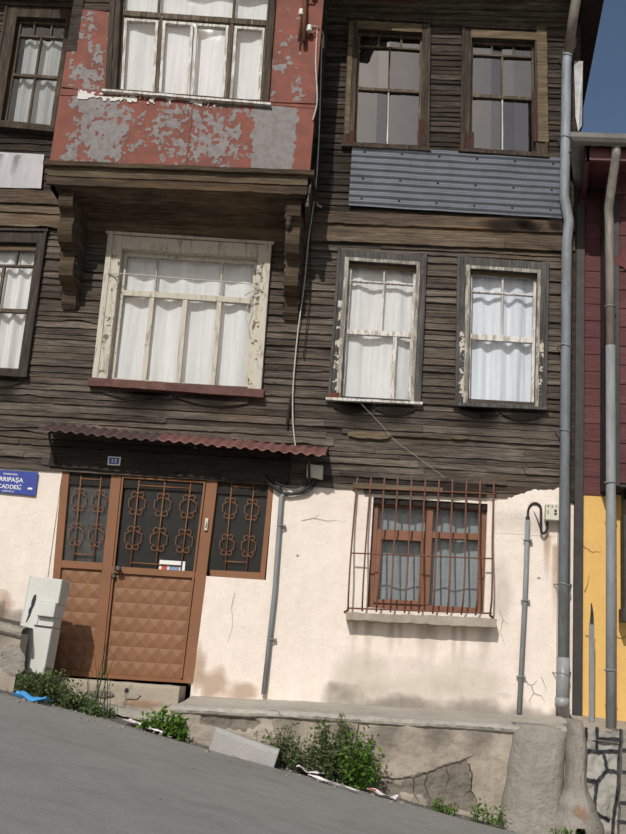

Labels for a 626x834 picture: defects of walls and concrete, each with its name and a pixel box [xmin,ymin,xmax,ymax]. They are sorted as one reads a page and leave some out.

peeling [59,11,310,169]
crack [356,723,477,806]